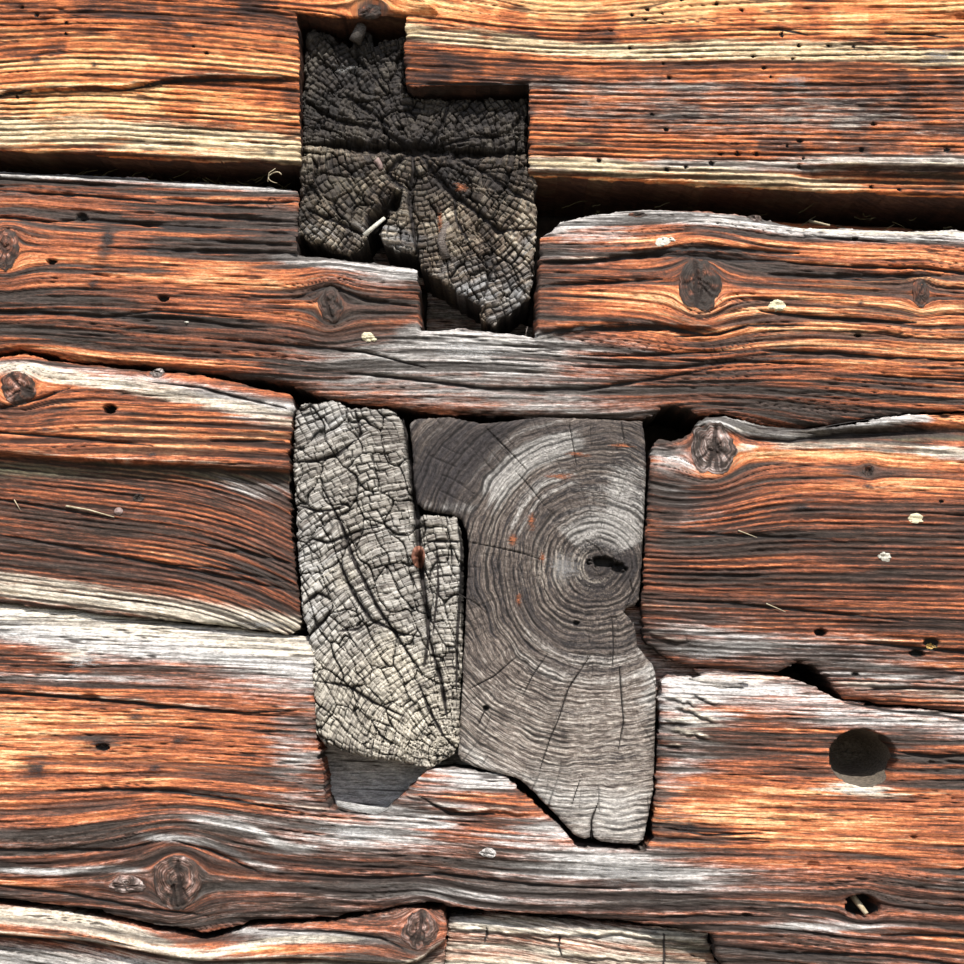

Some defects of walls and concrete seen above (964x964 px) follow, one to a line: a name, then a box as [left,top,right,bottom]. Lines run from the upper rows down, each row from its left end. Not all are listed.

crack [305,45,534,299]
crack [294,411,361,463]
crack [297,418,545,747]
crack [540,625,624,769]